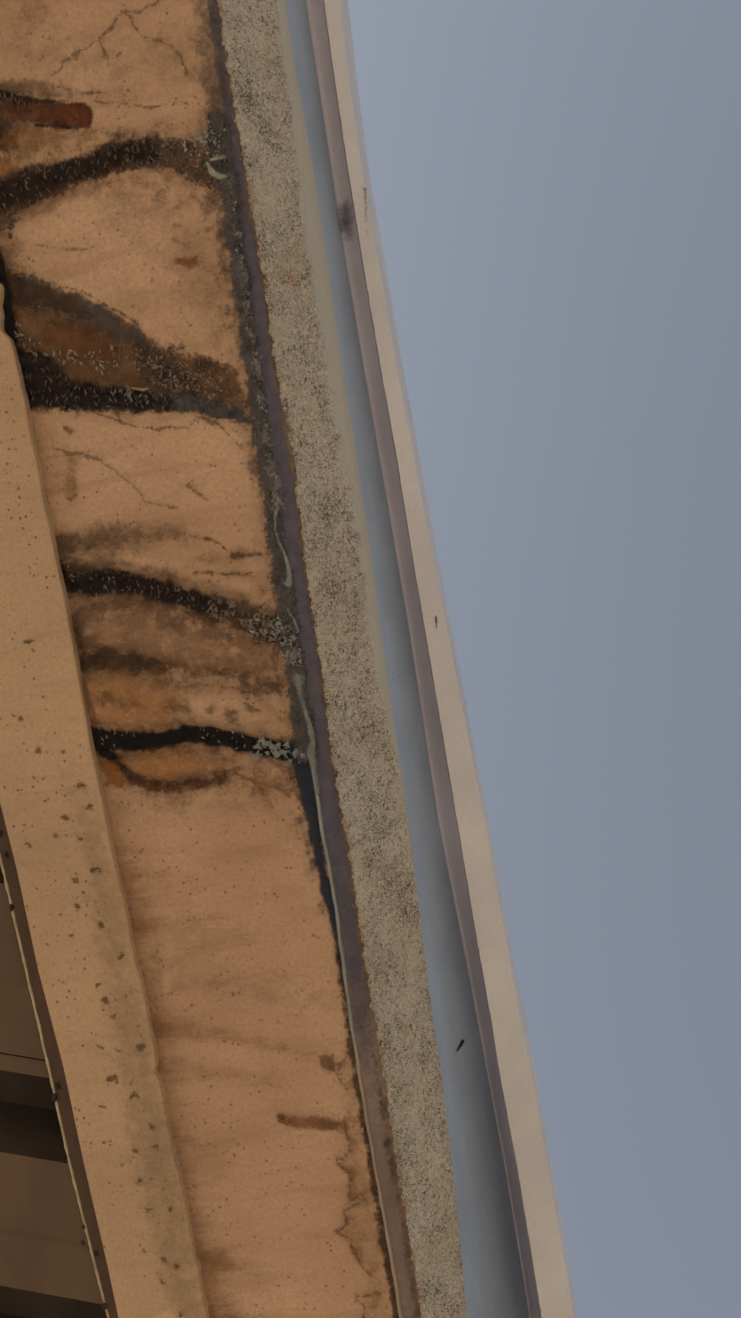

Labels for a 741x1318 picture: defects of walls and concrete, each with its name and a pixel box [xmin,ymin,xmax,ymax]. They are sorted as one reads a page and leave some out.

rust [0,81,97,175]
water stain [0,0,370,1043]
rust [278,1114,345,1132]